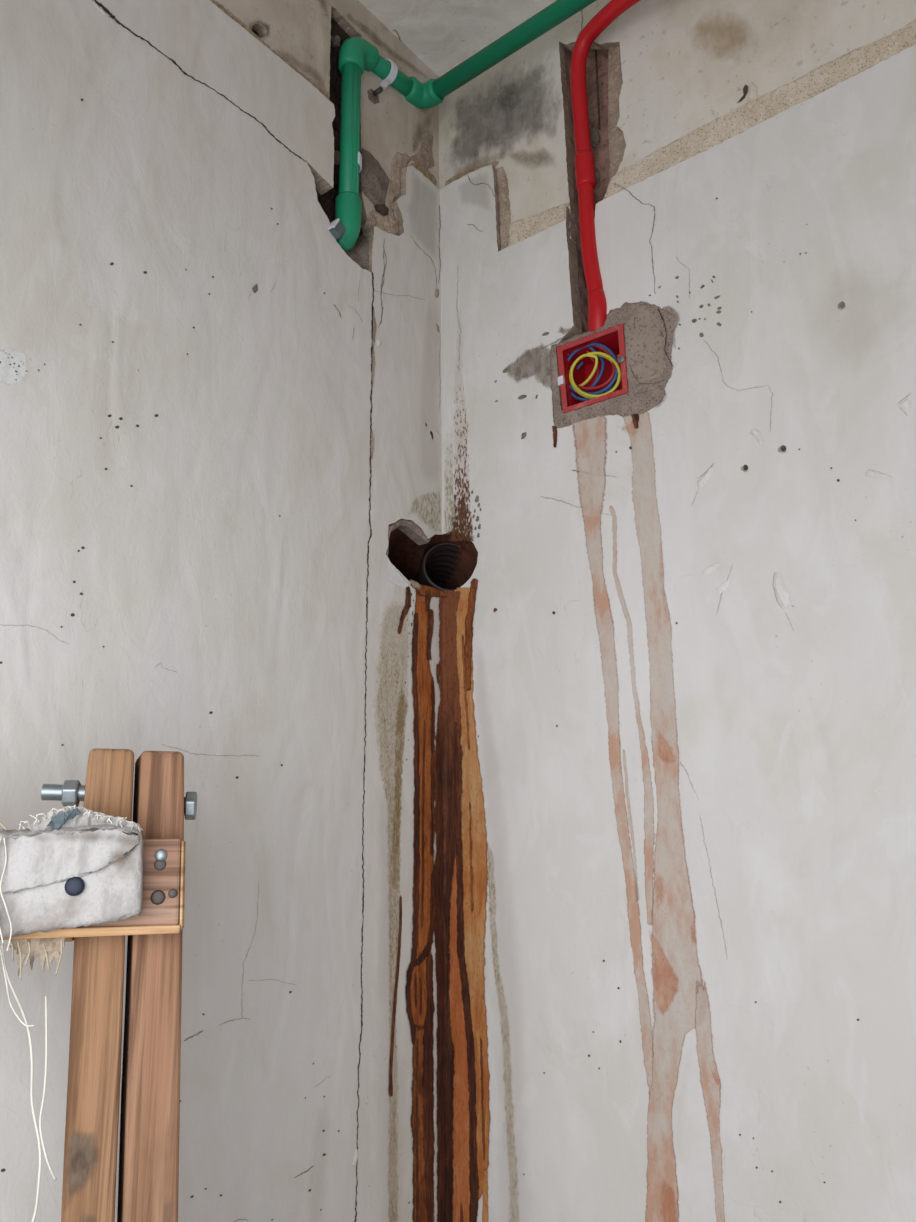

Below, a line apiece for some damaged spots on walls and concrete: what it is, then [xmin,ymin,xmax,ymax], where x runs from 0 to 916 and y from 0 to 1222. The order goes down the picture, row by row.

crack [93,0,307,162]
damp [455,73,546,170]
flaking render [586,19,916,207]
spalling [386,519,478,591]
corrosion [450,387,481,541]
crack [334,206,483,1222]
corrosion [388,579,490,1222]
corrosion [573,412,725,1222]